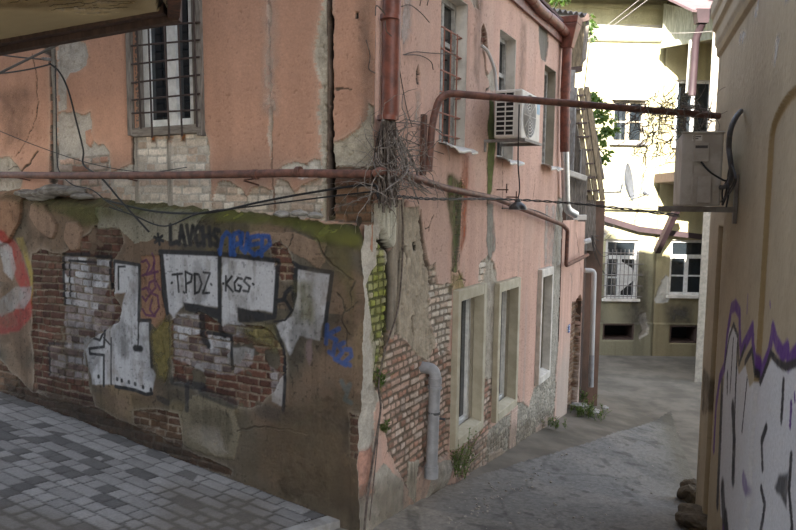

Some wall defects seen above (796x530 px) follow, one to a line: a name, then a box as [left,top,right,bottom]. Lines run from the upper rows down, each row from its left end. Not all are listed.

crack [266,0,276,215]
crack [334,85,352,93]
flaking render [0,41,492,487]
crack [315,237,358,348]
flaking render [358,463,374,530]